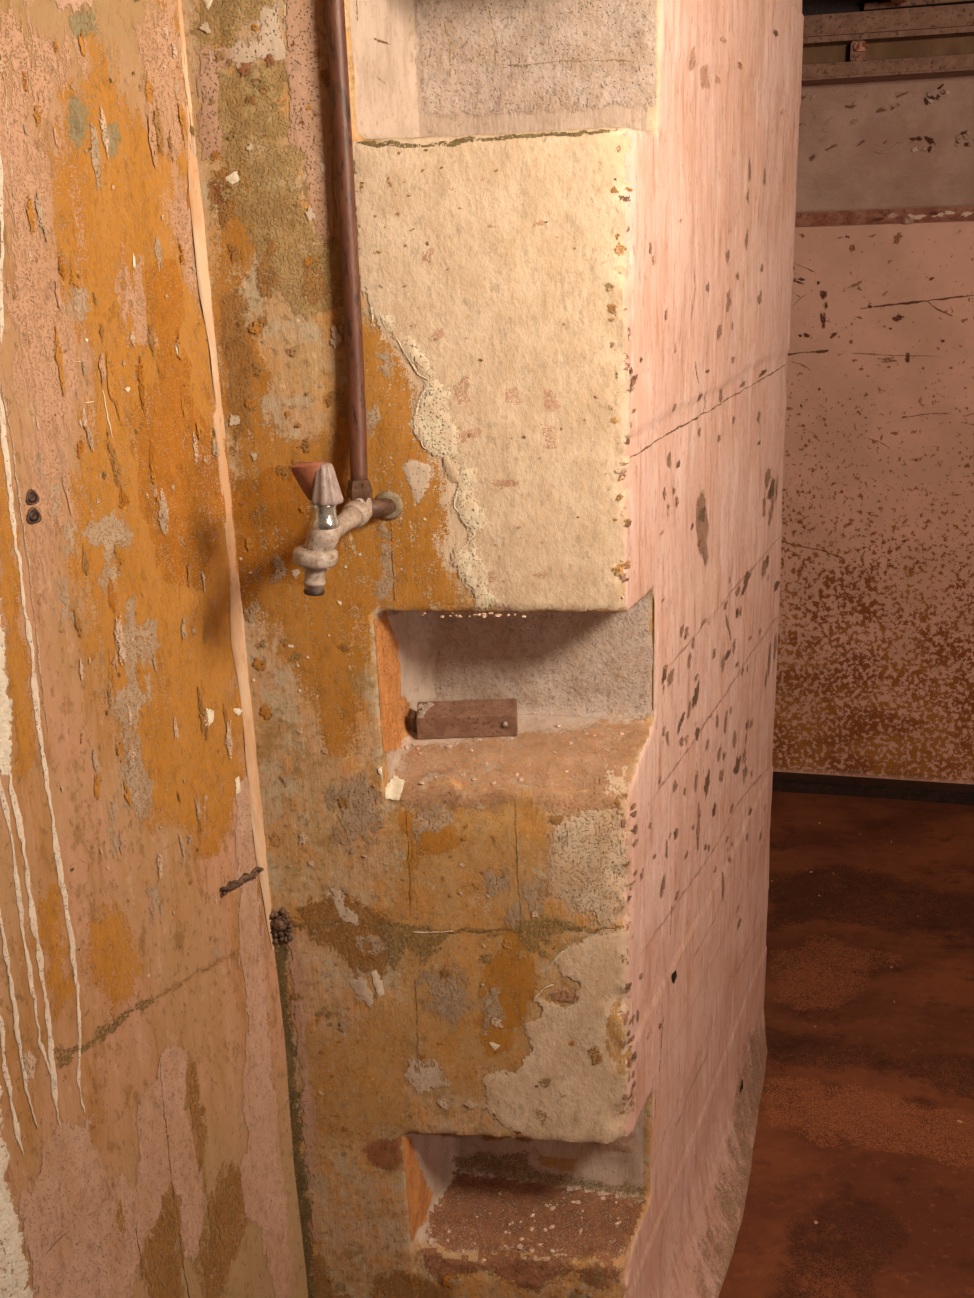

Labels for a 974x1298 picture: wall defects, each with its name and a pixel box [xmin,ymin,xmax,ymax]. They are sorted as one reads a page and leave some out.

peeling [132,0,337,241]
peeling [159,185,198,302]
peeling [0,0,168,870]
peeling [203,708,214,726]
peeling [229,399,256,426]
peeling [308,767,405,867]
peeling [352,0,753,1144]
peeling [713,555,780,689]
peeling [763,467,778,526]
rust [772,346,974,781]
peeling [211,775,309,1298]
peeling [287,886,390,1244]